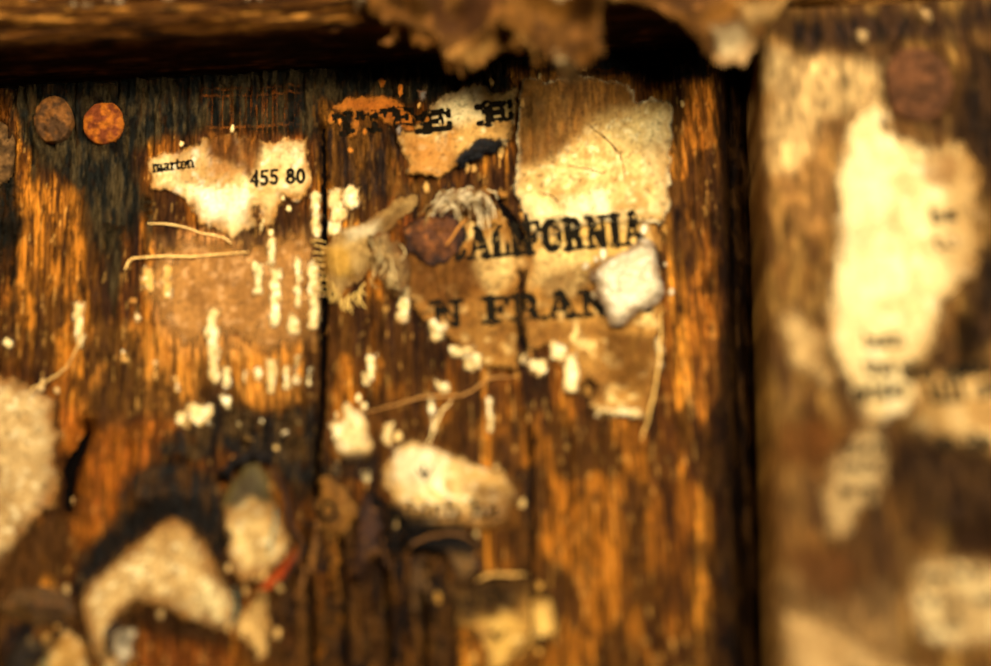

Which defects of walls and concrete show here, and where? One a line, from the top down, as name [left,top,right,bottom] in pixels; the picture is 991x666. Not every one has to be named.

corrosion [80,98,132,151]
peeling [310,185,358,238]
peeling [251,217,323,334]
peeling [72,301,87,348]
peeling [356,355,376,412]
peeling [396,287,411,323]
peeling [435,380,449,393]
peeling [429,319,481,372]
peeling [514,340,591,397]
peeling [382,422,403,447]
peeling [485,397,494,432]
peeling [594,407,651,422]